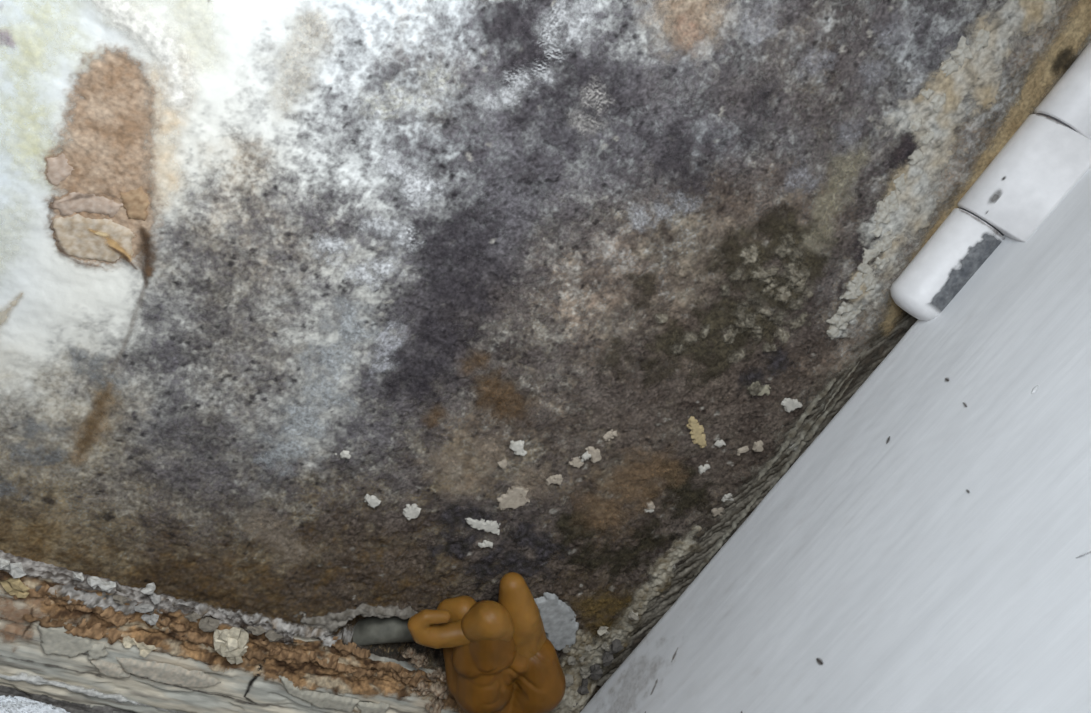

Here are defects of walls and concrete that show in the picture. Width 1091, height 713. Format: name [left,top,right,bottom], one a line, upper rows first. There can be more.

damp [1,5,56,173]
damp [150,67,179,203]
spalling [44,48,158,277]
peeling [364,494,381,508]
peeling [403,503,421,520]
peeling [465,485,530,548]
damp [0,597,43,642]
spalling [0,550,441,665]
damp [330,615,368,645]
damp [356,642,446,672]
peeling [0,673,185,713]
peeling [279,675,390,713]